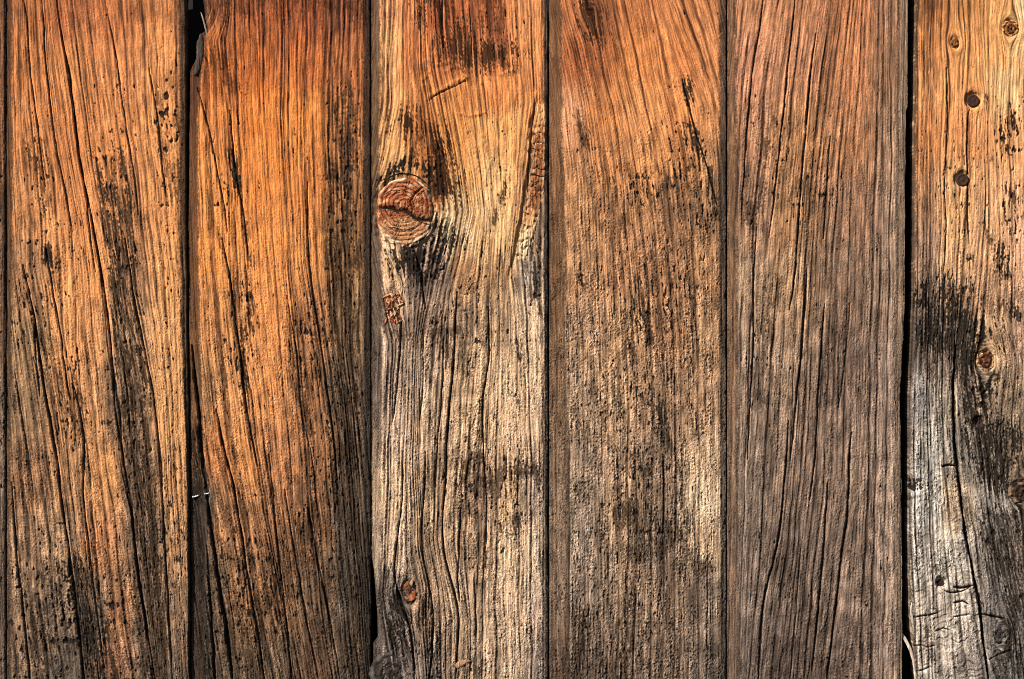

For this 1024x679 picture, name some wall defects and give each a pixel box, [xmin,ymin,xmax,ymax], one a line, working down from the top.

crack [913,350,1013,679]